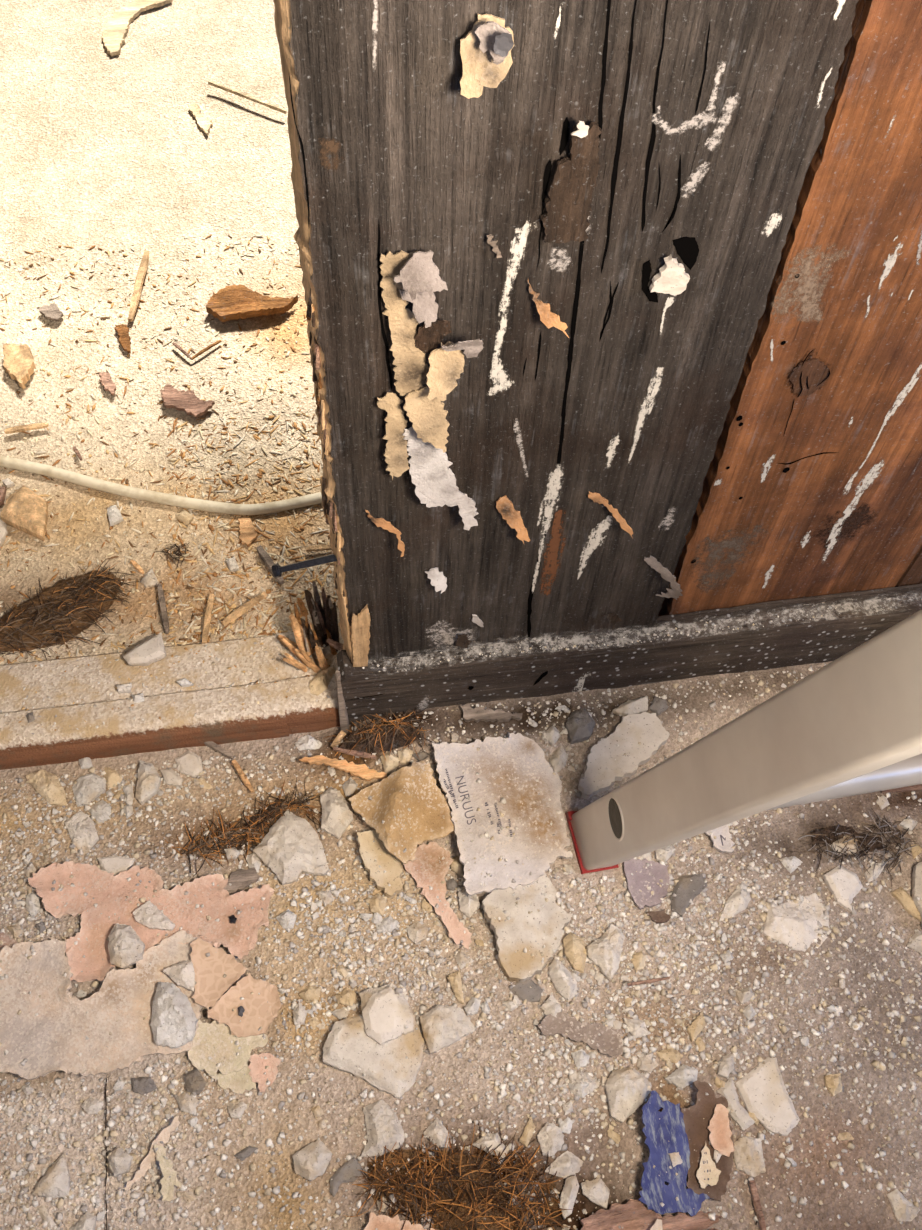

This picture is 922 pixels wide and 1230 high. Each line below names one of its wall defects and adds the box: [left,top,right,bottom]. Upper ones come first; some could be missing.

peeling [460,13,514,99]
crack [695,24,710,115]
crack [523,0,681,467]
crack [527,499,553,640]